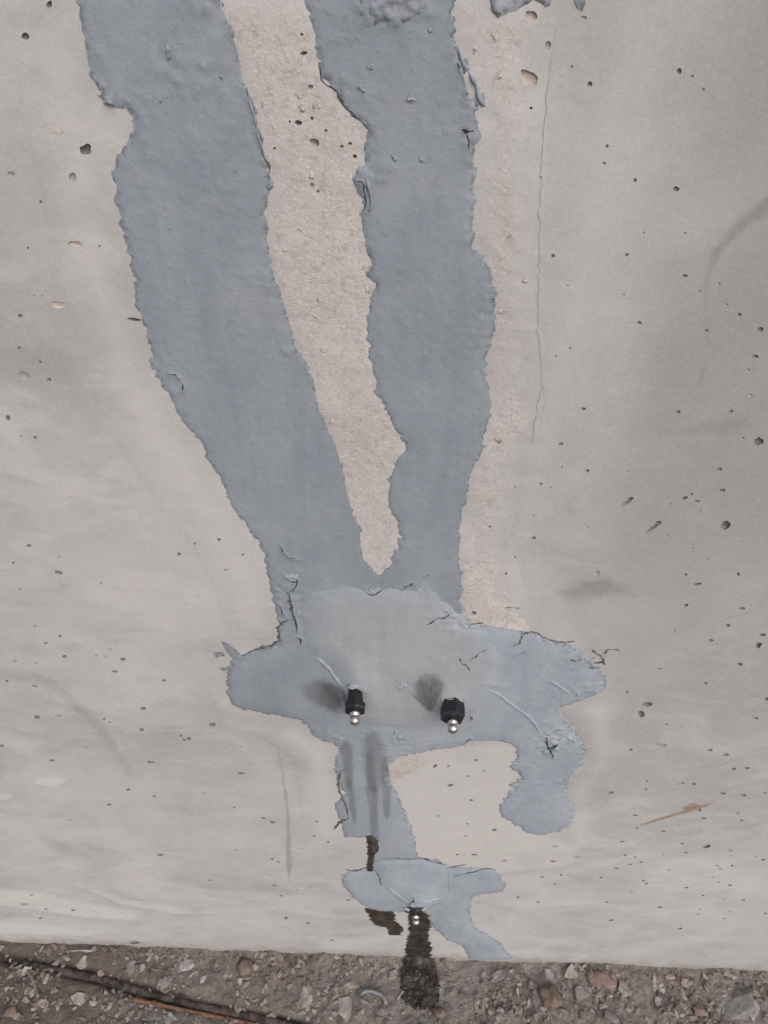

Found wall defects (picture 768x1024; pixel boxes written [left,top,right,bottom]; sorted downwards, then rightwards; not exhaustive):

spalling [11,0,348,850]
crack [242,579,301,656]
spalling [220,0,406,575]
spalling [451,0,558,625]
crack [465,607,620,669]
crack [532,33,556,440]
damp [366,835,379,871]
damp [364,907,440,1024]